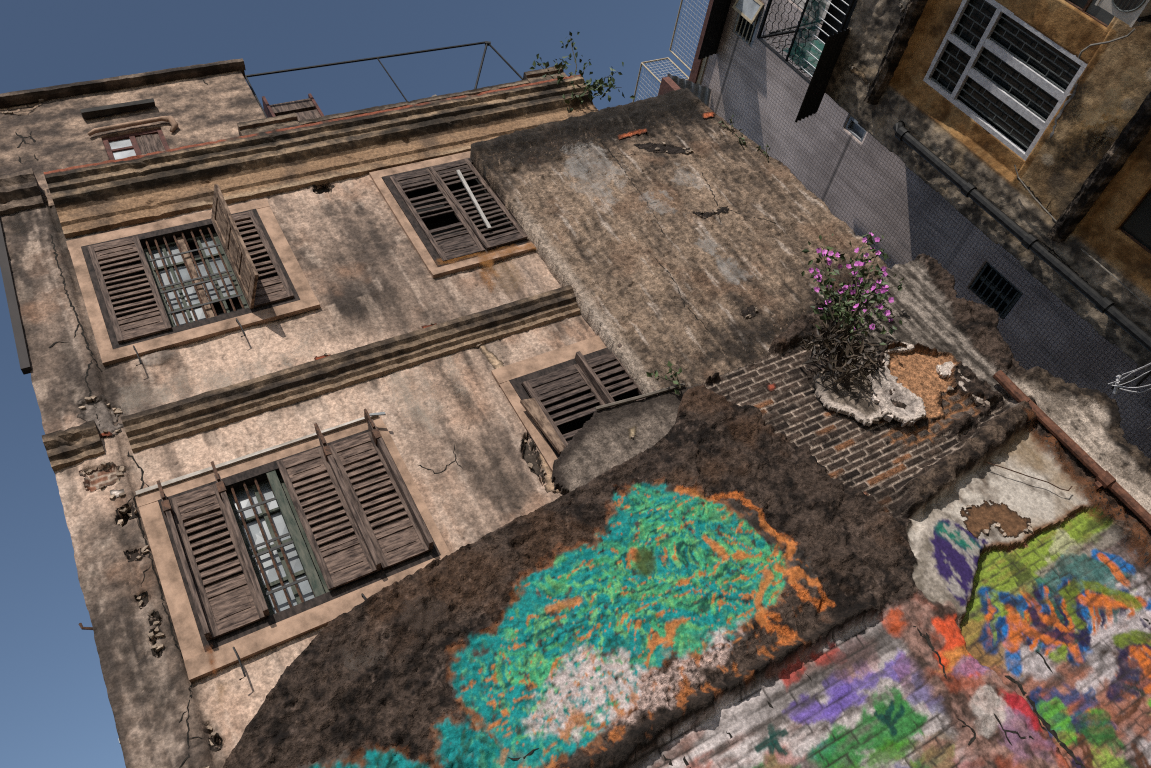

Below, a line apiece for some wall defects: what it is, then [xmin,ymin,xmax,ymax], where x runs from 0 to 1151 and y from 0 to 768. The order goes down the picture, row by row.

damp [1062,83,1087,119]
crack [15,131,38,163]
damp [1045,131,1110,169]
crack [48,234,107,426]
spalling [77,394,123,438]
flaking render [697,338,1018,521]
crack [419,445,462,474]
spalling [520,432,561,493]
spalling [79,461,139,527]
spalling [960,500,1033,538]
spalling [123,545,150,562]
spalling [134,591,165,658]